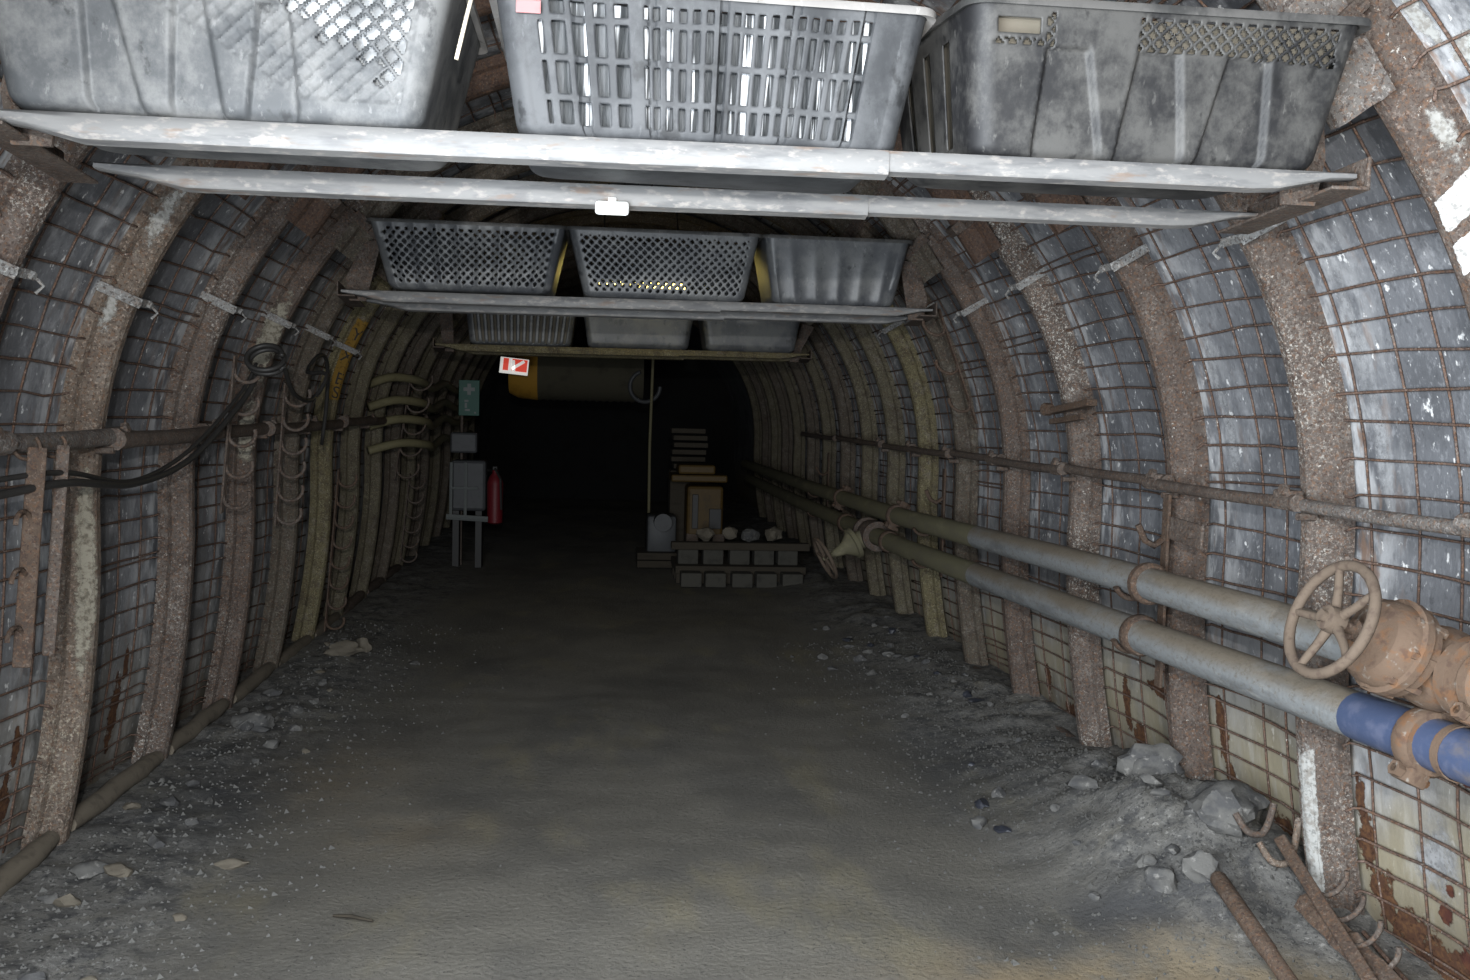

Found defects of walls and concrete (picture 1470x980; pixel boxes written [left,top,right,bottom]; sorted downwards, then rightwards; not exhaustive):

corrosion [1355,771,1470,980]